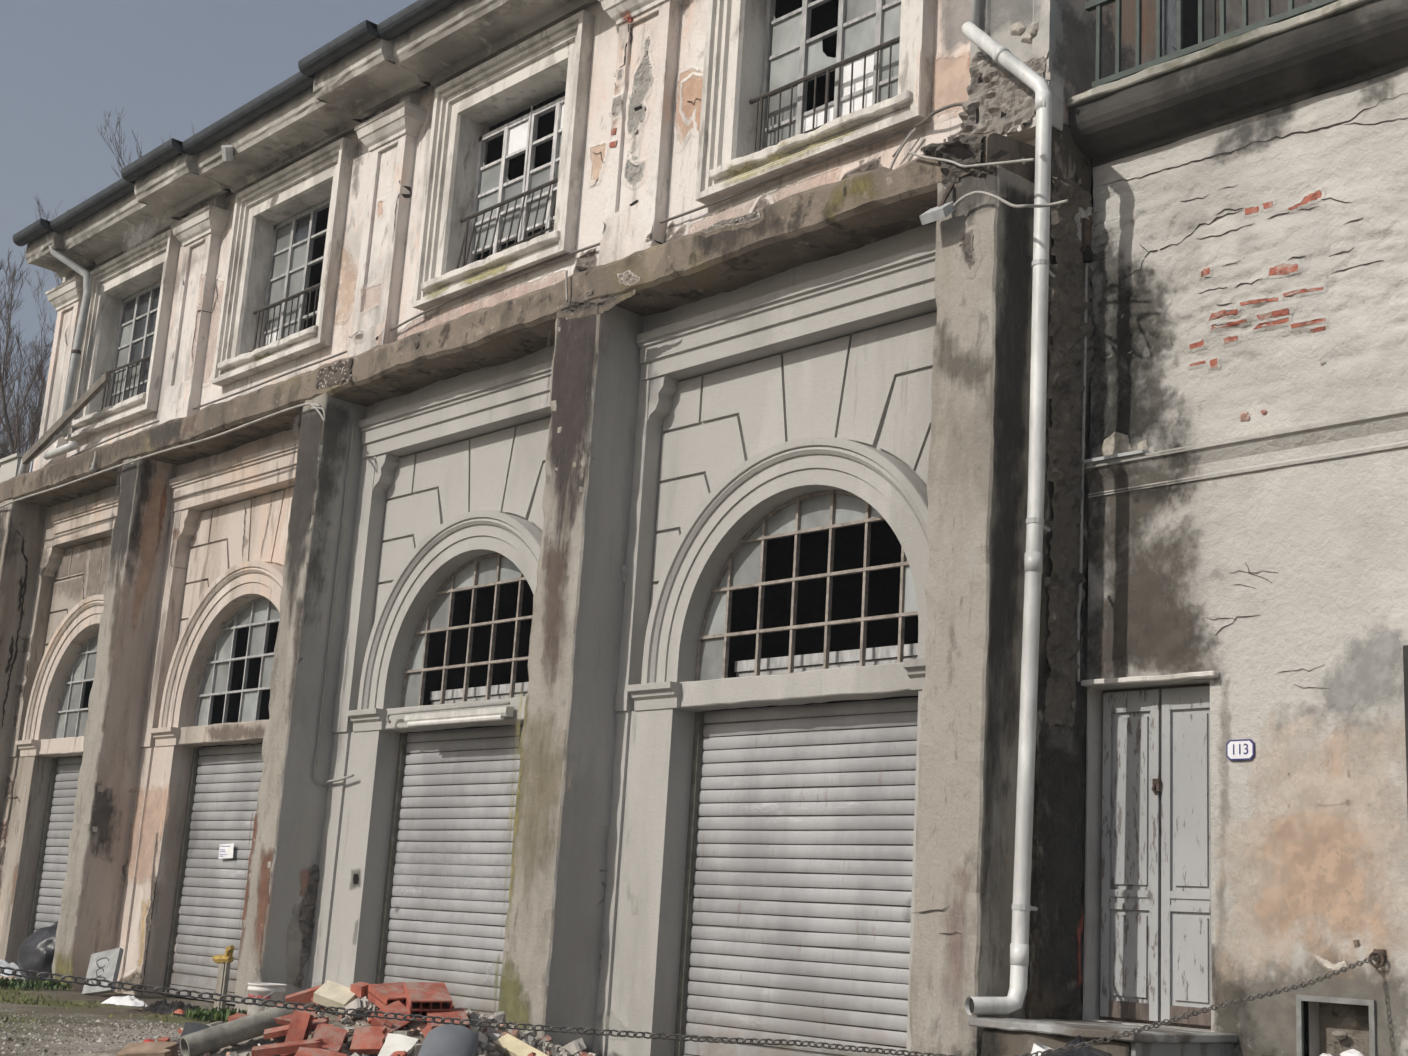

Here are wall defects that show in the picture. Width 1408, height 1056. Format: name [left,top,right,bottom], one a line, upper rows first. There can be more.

flaking render [586,30,704,206]
spalling [914,21,1051,184]
damp [1054,3,1134,102]
crack [1096,93,1408,329]
peeling [316,241,600,389]
flaking render [1187,259,1330,373]
crack [2,526,28,730]
damp [39,418,189,671]
damp [287,403,348,707]
damp [1027,241,1214,988]
damp [91,786,114,854]
flaking render [288,864,320,988]